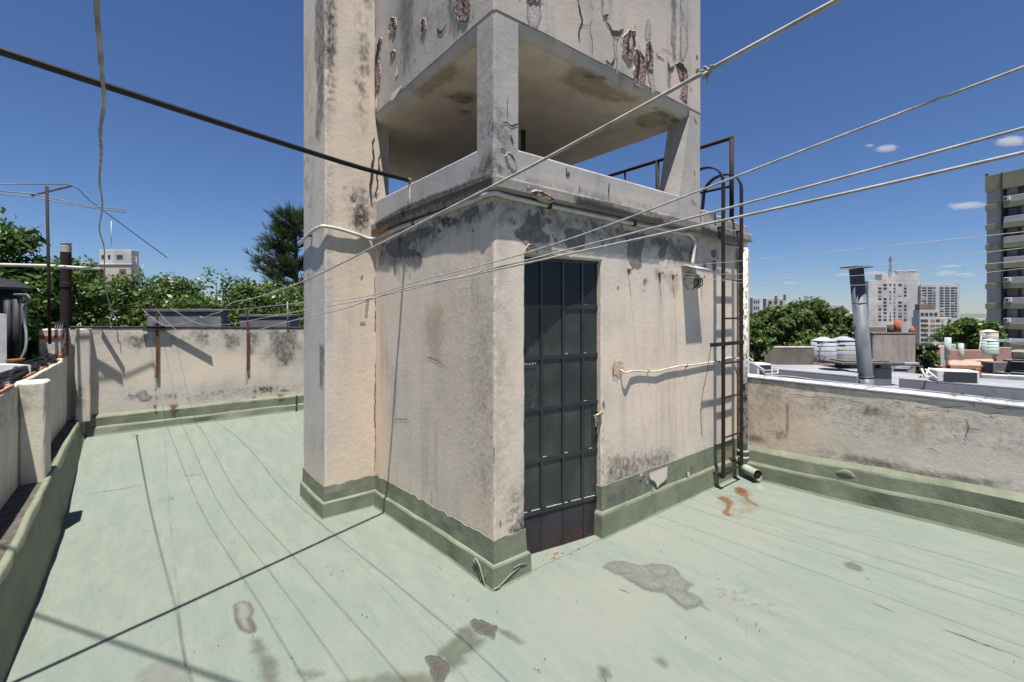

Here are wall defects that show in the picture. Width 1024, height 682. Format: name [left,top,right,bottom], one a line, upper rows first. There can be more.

spalling [420,17,428,37]
spalling [454,0,474,24]
spalling [374,16,402,101]
spalling [603,14,656,94]
spalling [675,24,699,104]
damp [353,155,510,266]
damp [273,333,295,364]
peeling [640,466,668,490]
corrosion [718,487,757,515]
damp [606,561,702,608]
damp [404,618,510,682]